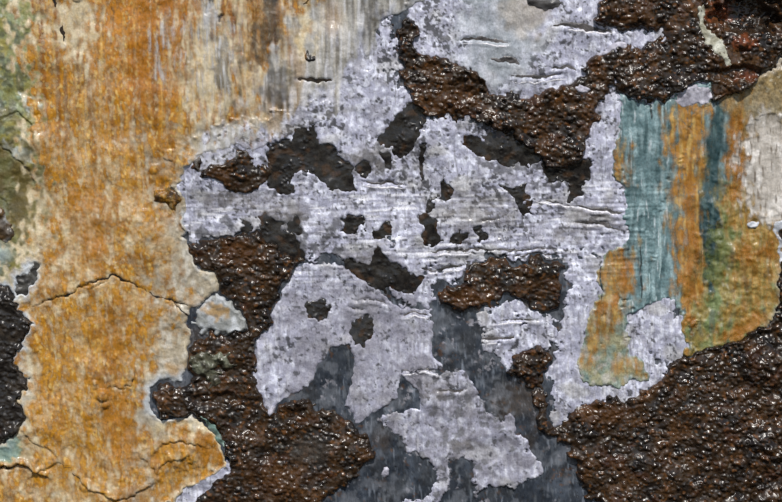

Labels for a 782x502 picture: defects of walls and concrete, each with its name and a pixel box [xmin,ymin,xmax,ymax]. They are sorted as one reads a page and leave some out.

crack [28,274,188,316]
corrosion [0,0,376,502]
peeling [176,0,712,502]
corrosion [391,0,782,328]
corrosion [506,107,782,502]
peeling [773,220,782,264]